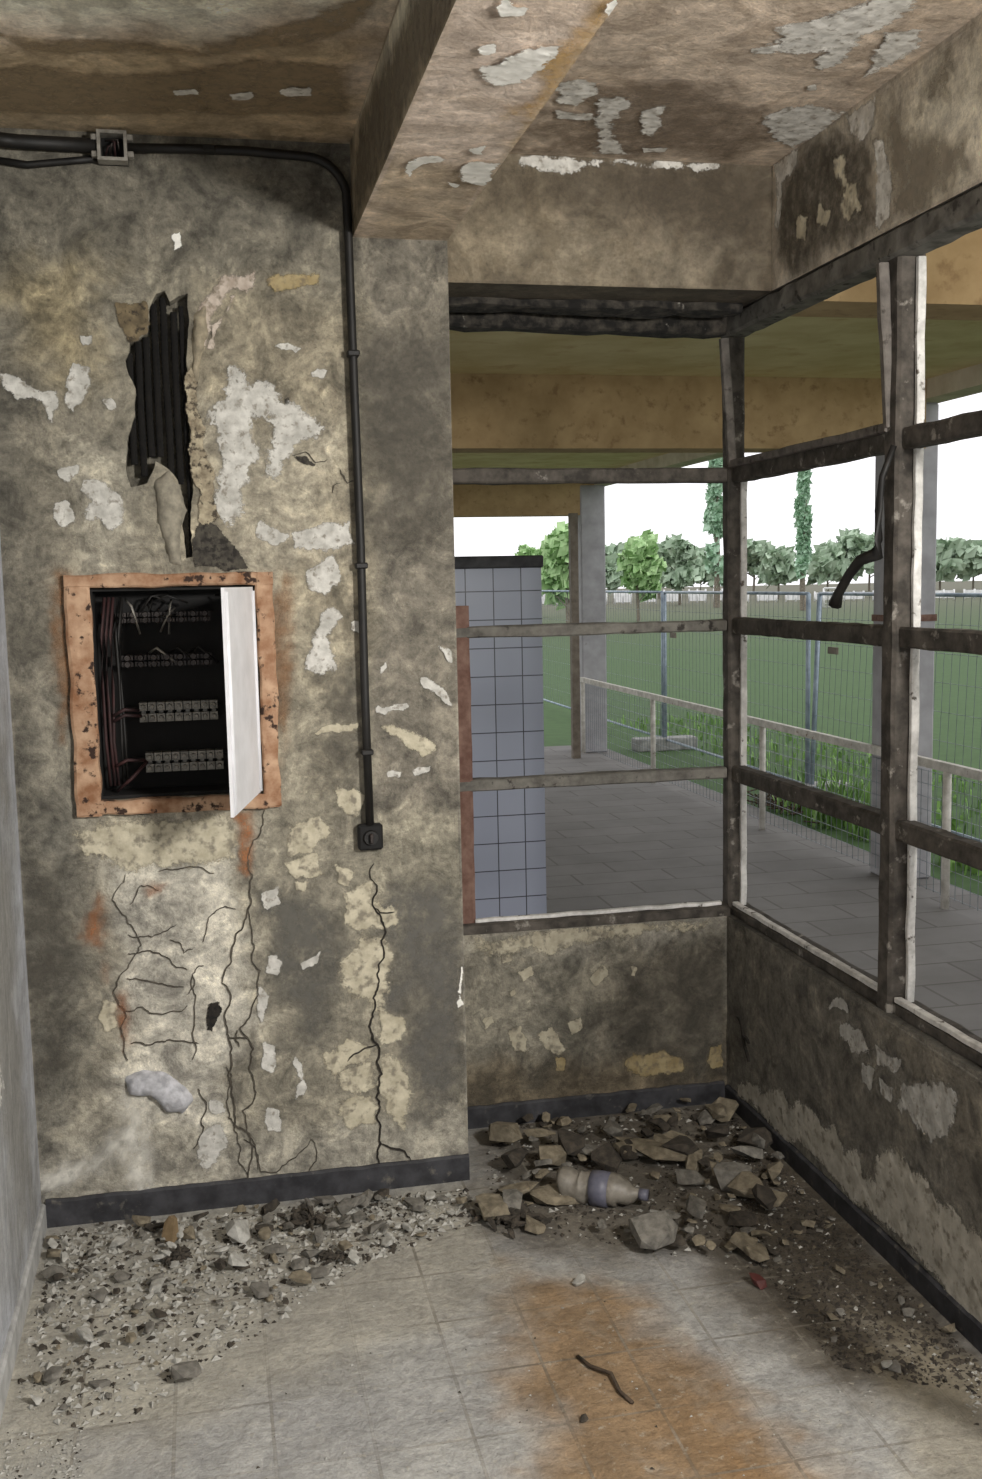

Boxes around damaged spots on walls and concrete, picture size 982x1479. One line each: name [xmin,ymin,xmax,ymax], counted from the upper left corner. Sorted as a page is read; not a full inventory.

damp [0,0,373,116]
peeling [518,79,719,175]
damp [779,134,871,274]
peeling [751,0,922,241]
damp [890,120,969,214]
peeling [0,363,116,423]
peeling [184,271,359,675]
peeling [376,703,436,778]
crack [112,810,317,1179]
crack [347,863,411,1164]
peeling [829,997,959,1143]
flaking render [737,1079,982,1324]